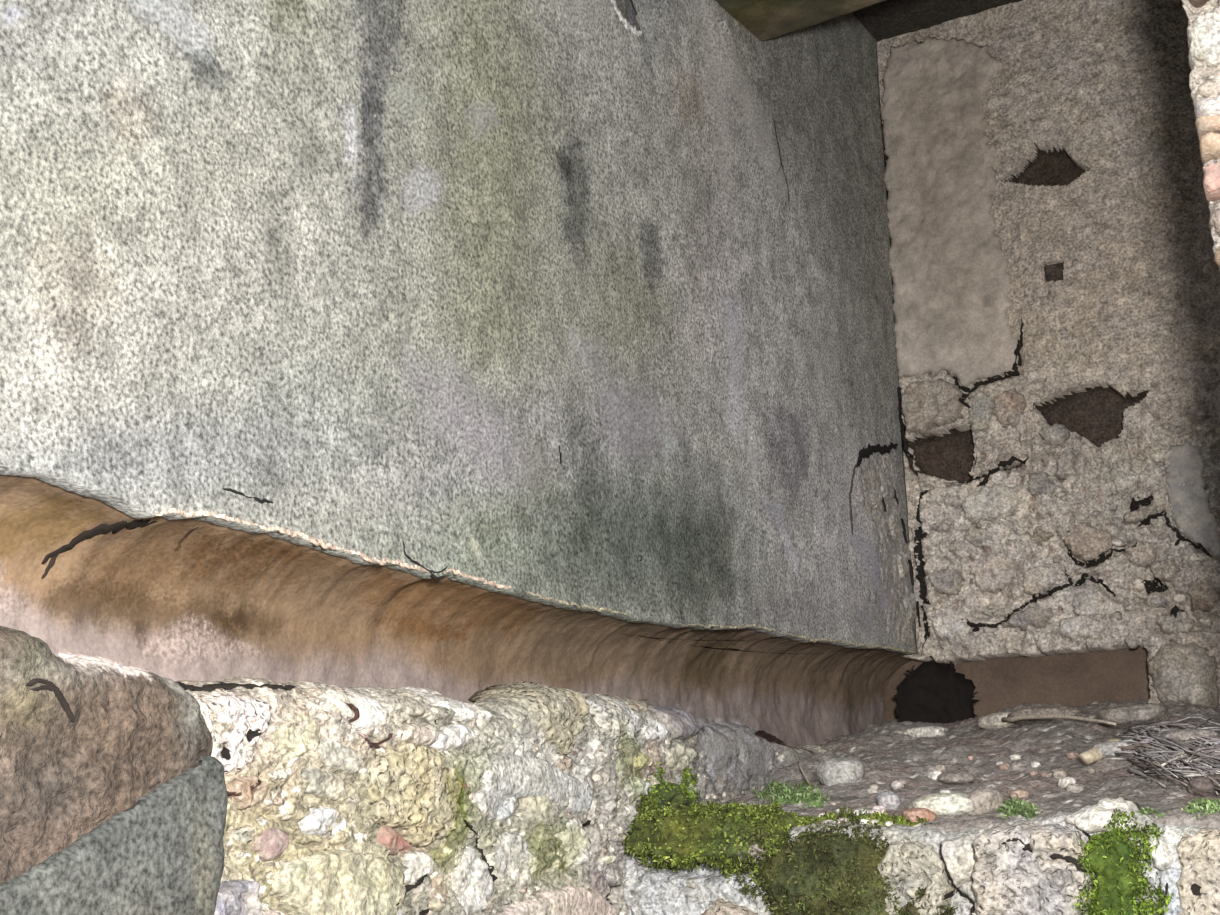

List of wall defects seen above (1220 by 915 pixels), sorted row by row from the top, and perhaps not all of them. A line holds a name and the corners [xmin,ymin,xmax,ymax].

spalling [611,0,643,37]
leakage [344,109,357,161]
crack [973,456,1028,487]
crack [223,488,274,504]
crack [41,519,157,579]
crack [175,527,198,551]
crack [961,511,1212,632]